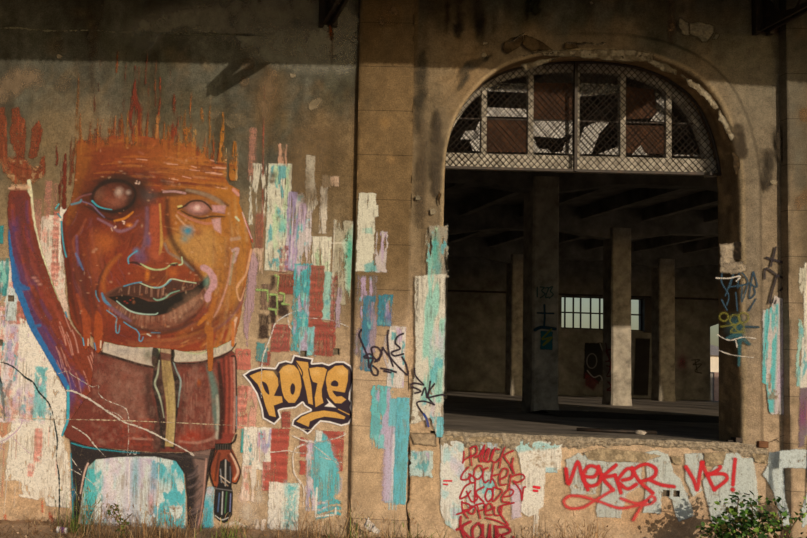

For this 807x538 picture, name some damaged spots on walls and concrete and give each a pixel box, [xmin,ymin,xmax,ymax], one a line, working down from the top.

water stain [460,55,492,87]
peeling [503,34,734,141]
spalling [678,18,720,42]
crack [0,362,337,520]